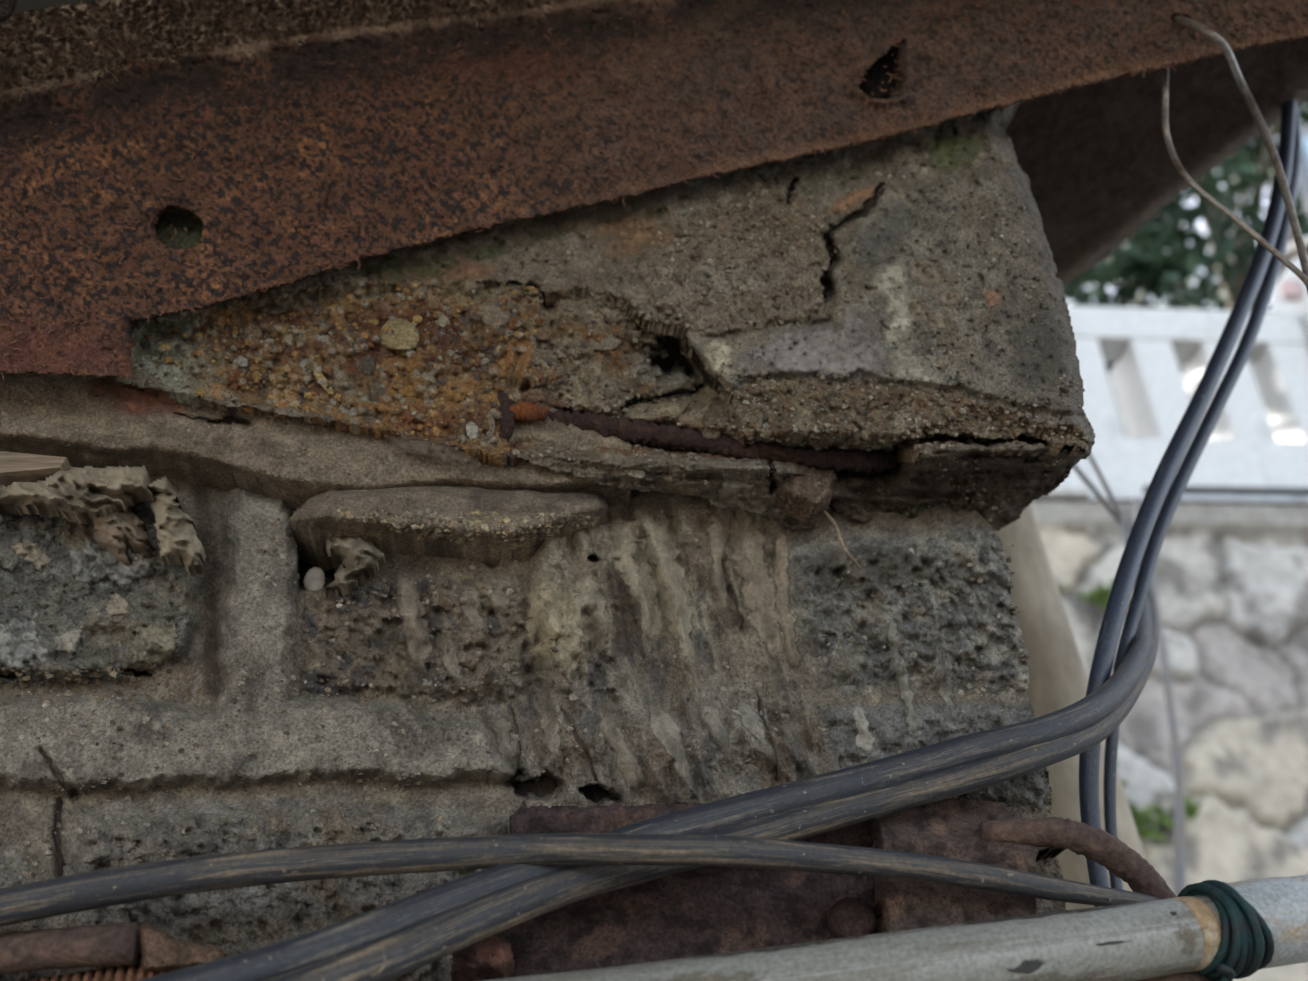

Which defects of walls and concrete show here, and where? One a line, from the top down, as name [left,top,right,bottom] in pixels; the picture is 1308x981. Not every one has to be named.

crack [786,177,798,203]
corrosion [827,187,875,215]
corrosion [573,214,673,255]
crack [820,184,885,300]
spalling [131,185,1092,526]
crack [893,434,1085,453]
peeling [12,539,53,571]
peeling [69,540,178,666]
peeling [0,612,82,670]
crack [40,750,77,877]